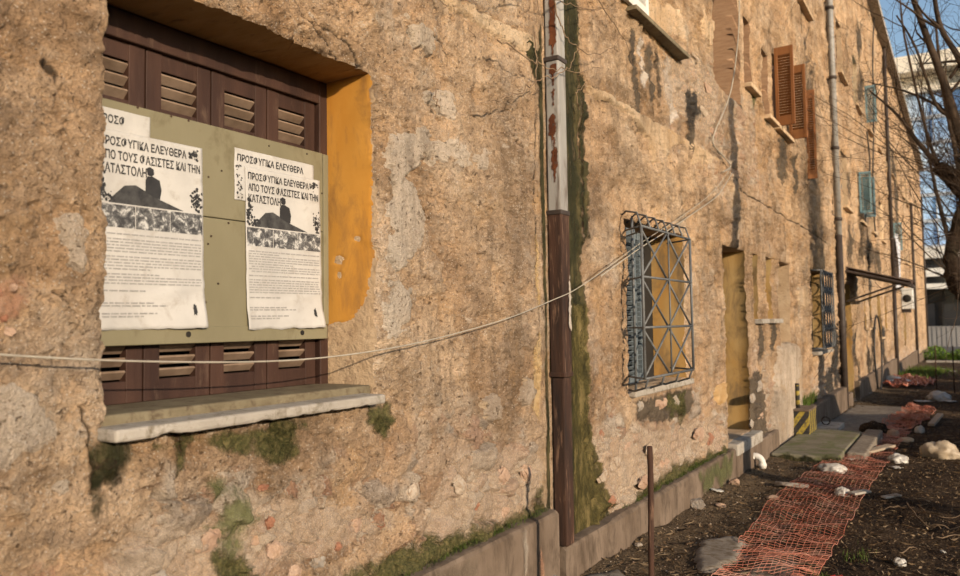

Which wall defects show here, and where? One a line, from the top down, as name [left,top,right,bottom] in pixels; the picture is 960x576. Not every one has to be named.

spalling [404,13,439,58]
corrosion [548,0,558,182]
peeling [327,74,489,340]
water stain [564,0,616,534]
spalling [0,382,57,472]
water stain [171,433,188,474]
water stain [264,418,299,465]
spalling [195,528,222,553]
spalling [250,515,285,560]
spalling [288,542,342,576]